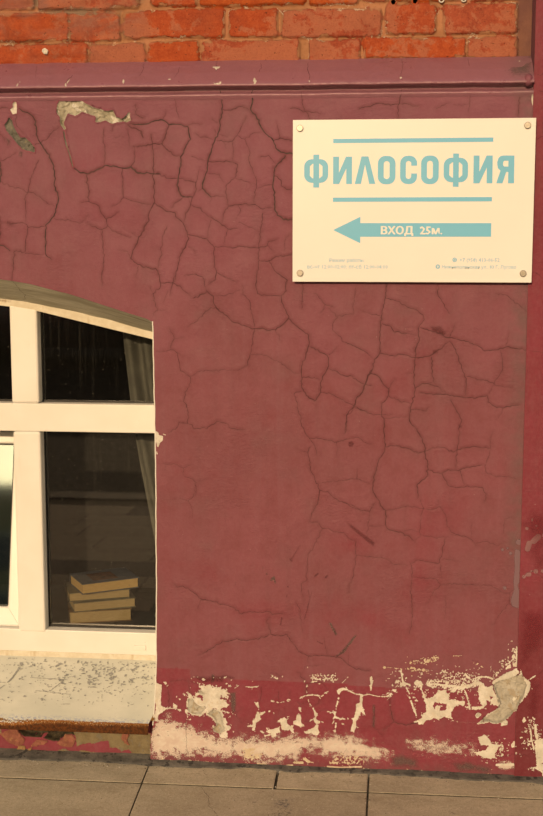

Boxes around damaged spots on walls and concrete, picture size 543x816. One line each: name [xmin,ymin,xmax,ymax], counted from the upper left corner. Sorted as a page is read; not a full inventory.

spalling [2,101,36,154]
spalling [55,100,132,168]
crack [0,90,538,715]
peeling [0,658,268,764]
spalling [247,641,536,737]
peeling [324,748,369,769]
peeling [471,717,543,776]